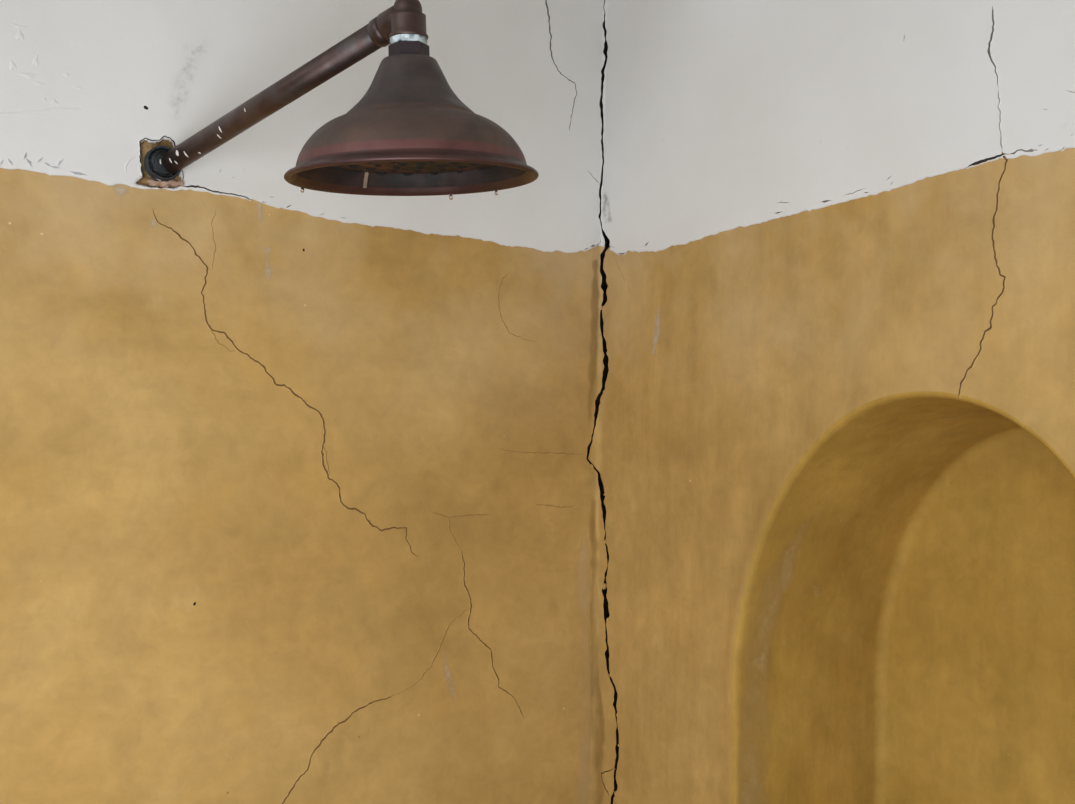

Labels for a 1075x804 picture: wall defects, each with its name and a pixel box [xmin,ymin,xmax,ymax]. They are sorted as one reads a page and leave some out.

spalling [0,152,86,176]
crack [152,185,418,557]
crack [497,0,619,804]
crack [959,6,1037,399]
crack [281,512,524,804]